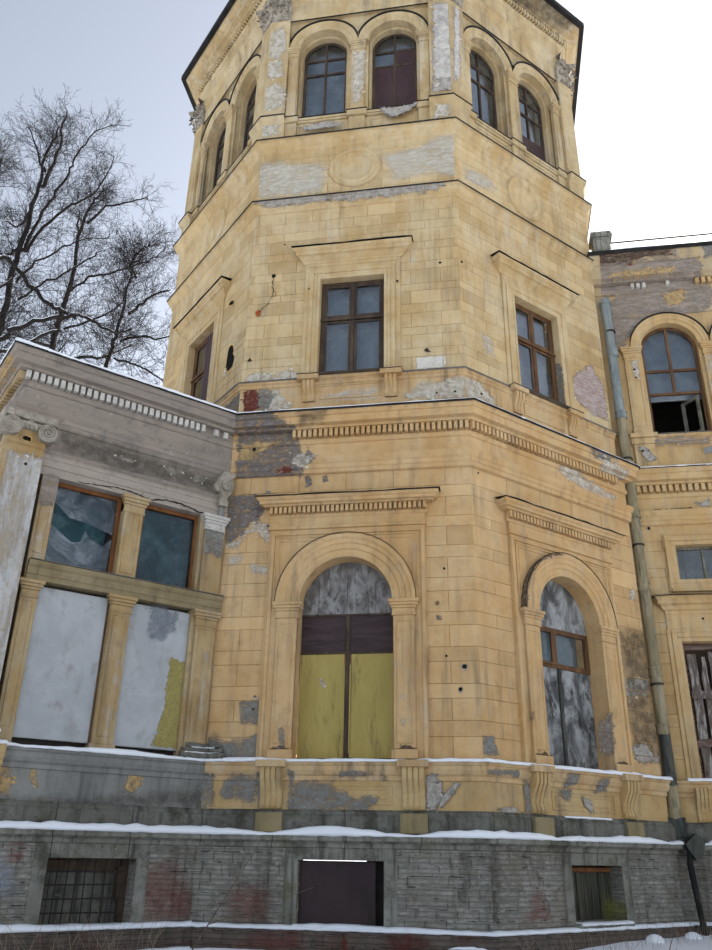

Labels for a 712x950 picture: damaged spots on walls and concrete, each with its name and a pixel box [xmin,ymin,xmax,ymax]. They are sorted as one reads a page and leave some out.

peeling [430,2,461,92]
peeling [434,104,450,119]
flaking render [224,368,329,487]
peeling [405,348,496,405]
flaking render [573,365,608,421]
peeling [0,448,59,679]
flaking render [204,491,271,576]
water stain [621,632,659,754]
flaking render [632,743,660,764]